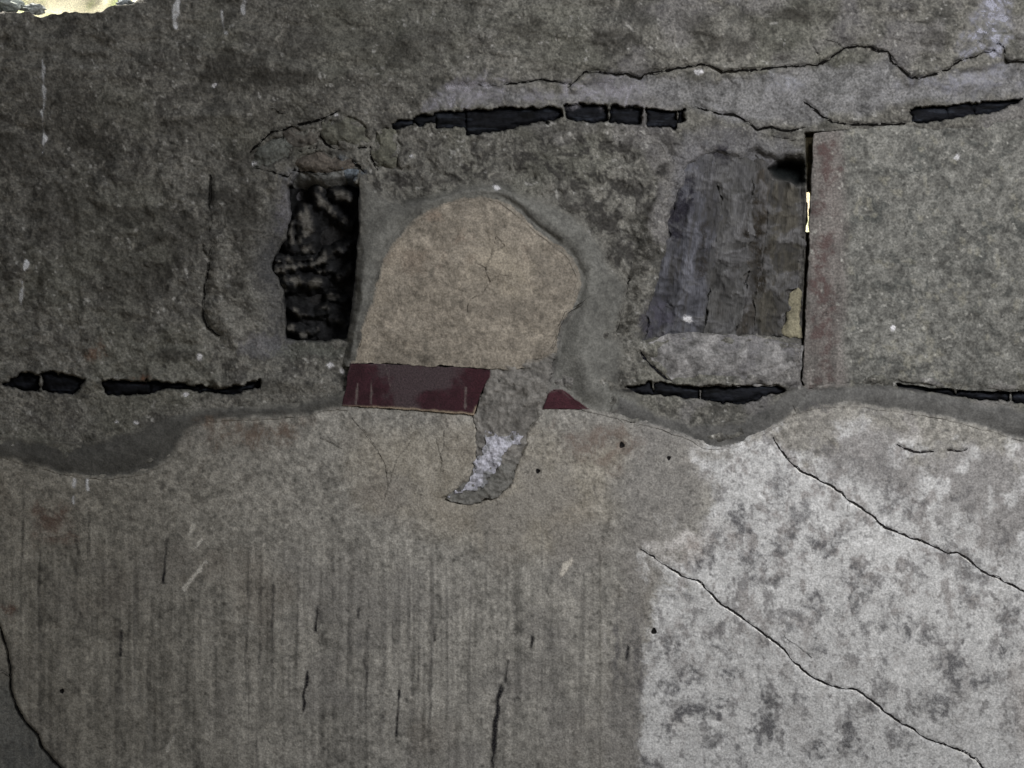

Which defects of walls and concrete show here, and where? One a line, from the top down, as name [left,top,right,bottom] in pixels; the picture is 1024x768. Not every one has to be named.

crack [478,29,1024,88]
crack [689,102,908,151]
spalling [446,352,556,505]
crack [773,437,1024,593]
crack [0,627,62,768]
crack [641,549,984,768]